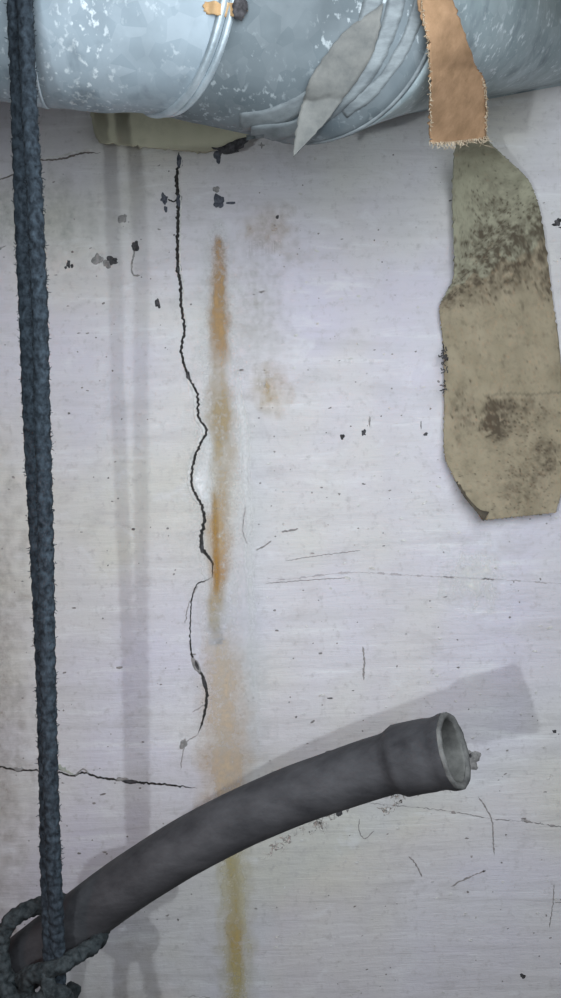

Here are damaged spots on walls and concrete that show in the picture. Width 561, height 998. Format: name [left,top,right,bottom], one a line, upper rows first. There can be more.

crack [40,149,100,161]
corrosion [211,240,227,367]
crack [0,152,214,788]
corrosion [207,389,230,621]